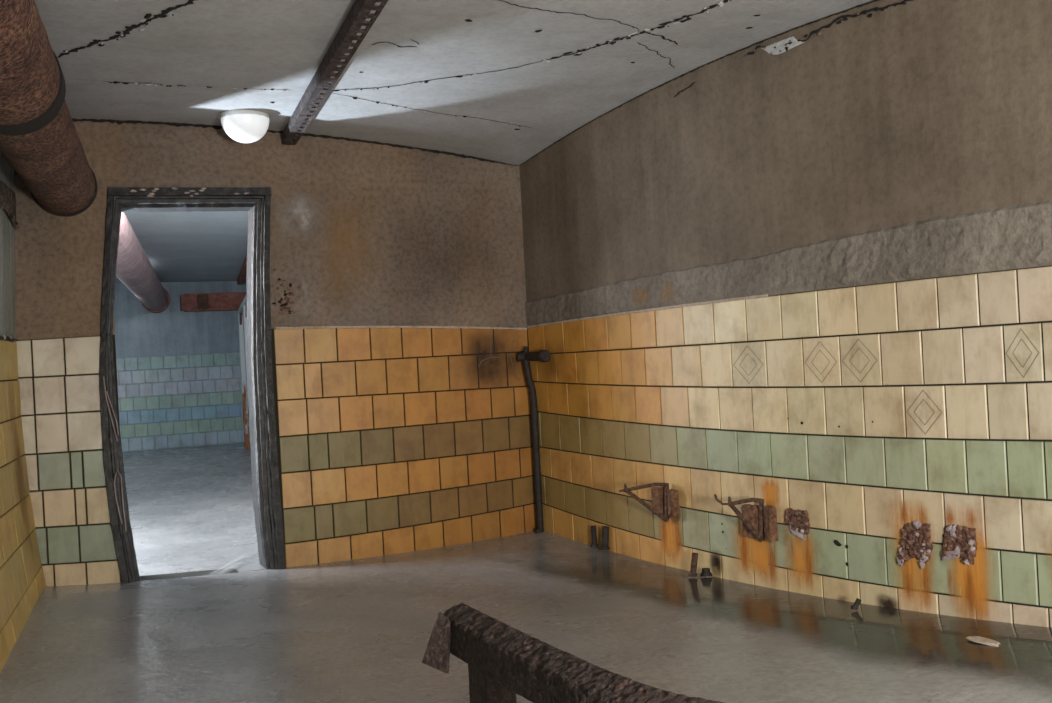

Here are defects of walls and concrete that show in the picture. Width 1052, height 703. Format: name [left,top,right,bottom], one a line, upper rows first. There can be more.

crack [57,0,286,91]
flaking render [761,37,804,55]
crack [267,0,912,166]
crack [72,118,223,129]
corrosion [763,481,778,506]
corrosion [737,524,774,575]
corrosion [791,536,812,581]
corrosion [901,558,928,598]
corrosion [949,515,988,614]